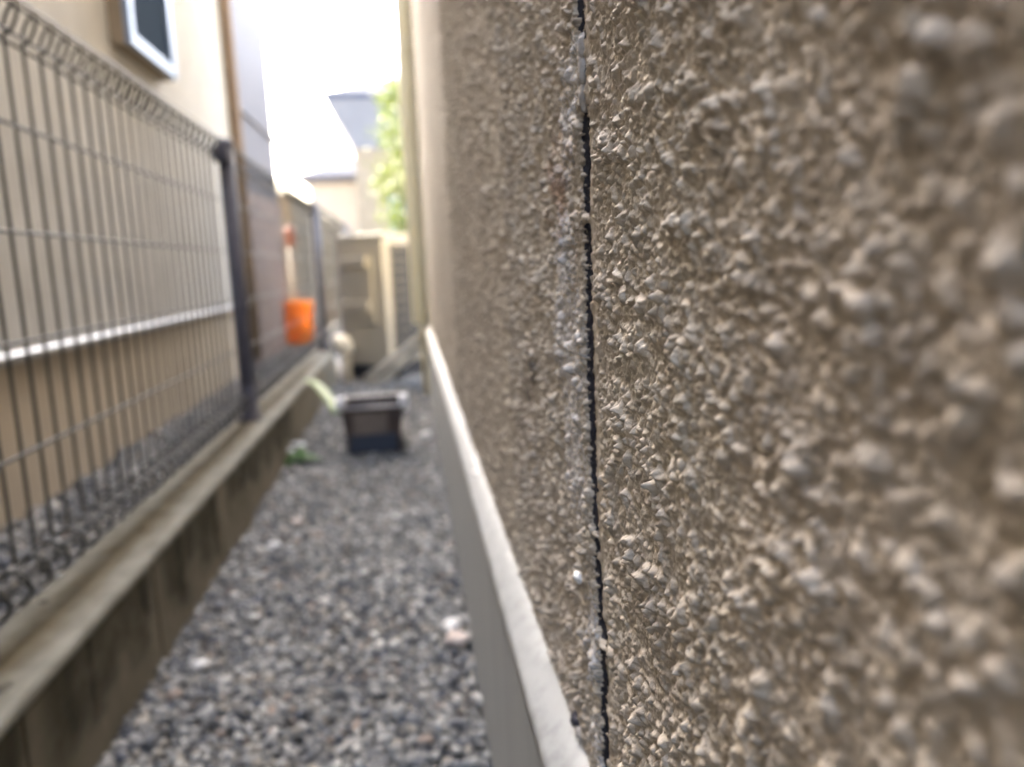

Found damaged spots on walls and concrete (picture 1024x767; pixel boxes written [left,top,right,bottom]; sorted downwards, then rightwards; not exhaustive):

crack [577,0,609,767]